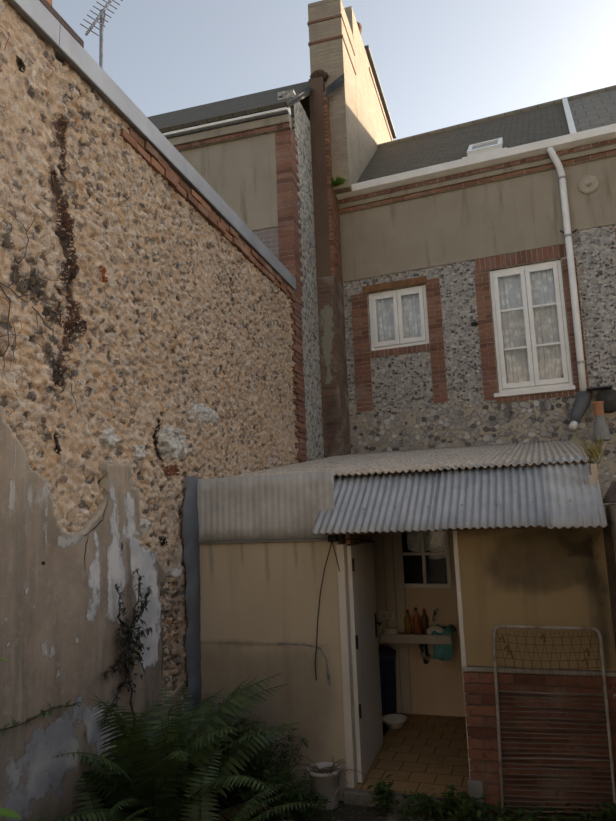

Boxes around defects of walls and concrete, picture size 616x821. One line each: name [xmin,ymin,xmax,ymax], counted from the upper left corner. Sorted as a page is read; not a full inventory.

peeling [87,481,184,704]
peeling [2,688,128,821]